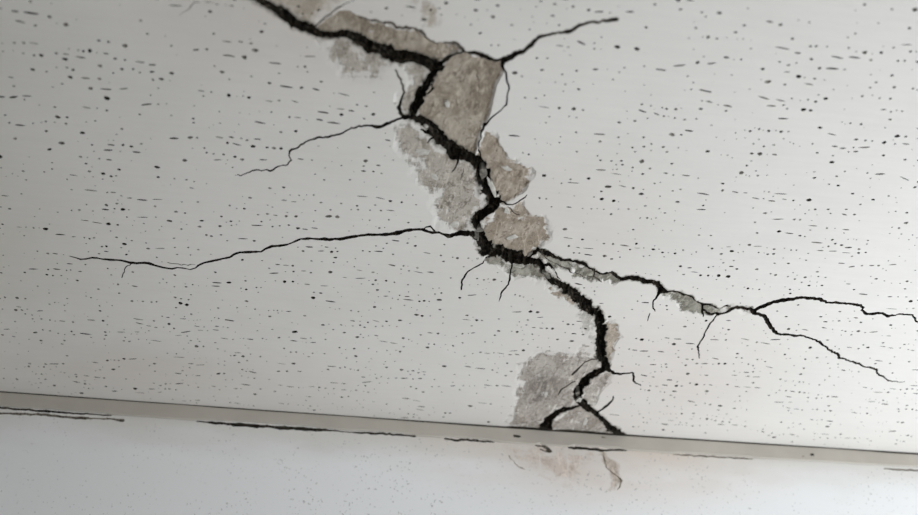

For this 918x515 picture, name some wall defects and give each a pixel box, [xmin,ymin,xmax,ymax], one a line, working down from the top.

spalling [312,9,621,311]
crack [70,0,918,432]
spalling [502,319,624,438]
spalling [661,289,754,319]